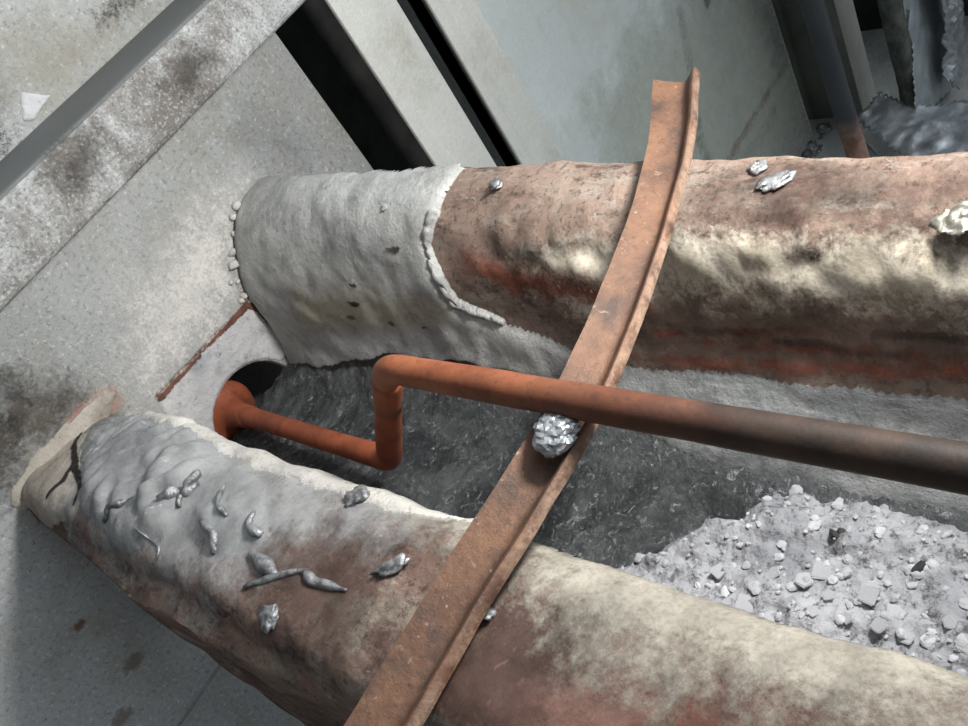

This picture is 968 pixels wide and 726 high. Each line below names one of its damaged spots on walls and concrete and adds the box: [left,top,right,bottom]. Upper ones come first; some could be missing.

crack [45,431,83,506]